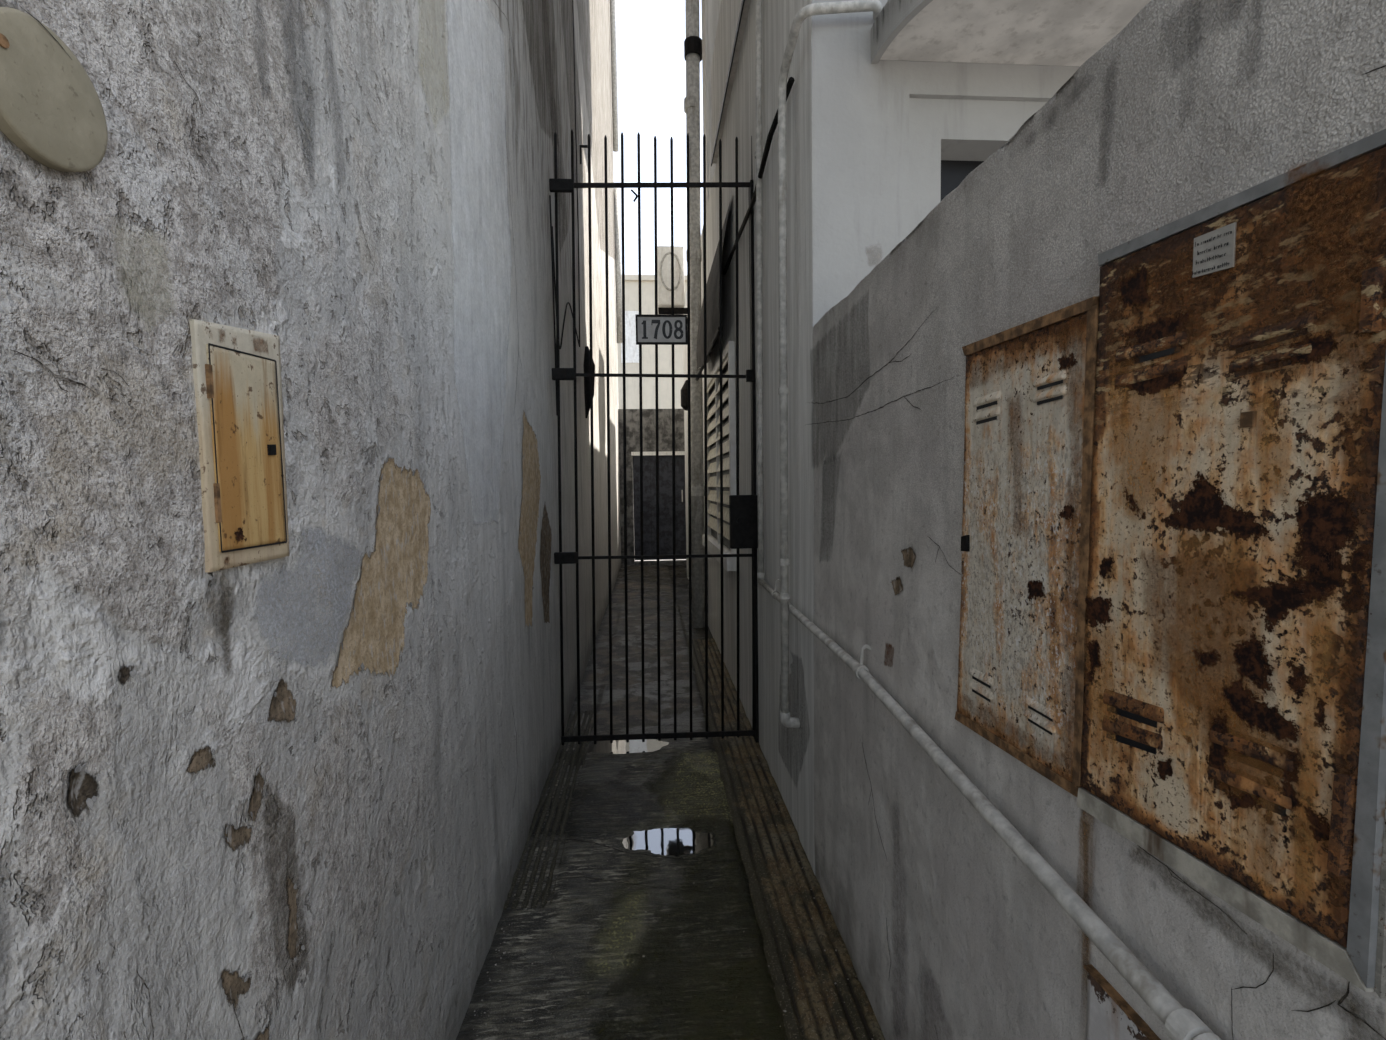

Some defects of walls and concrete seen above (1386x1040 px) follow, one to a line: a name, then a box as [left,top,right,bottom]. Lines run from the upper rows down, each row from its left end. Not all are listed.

spalling [518,412,552,627]
spalling [330,458,431,688]
spalling [890,547,916,595]
spalling [267,678,297,723]
spalling [186,745,216,774]
spalling [67,763,102,817]
spalling [225,768,265,852]
corrosion [1078,810,1090,906]
spalling [221,970,252,1017]
crack [1231,953,1274,1037]
crack [1292,982,1386,1040]